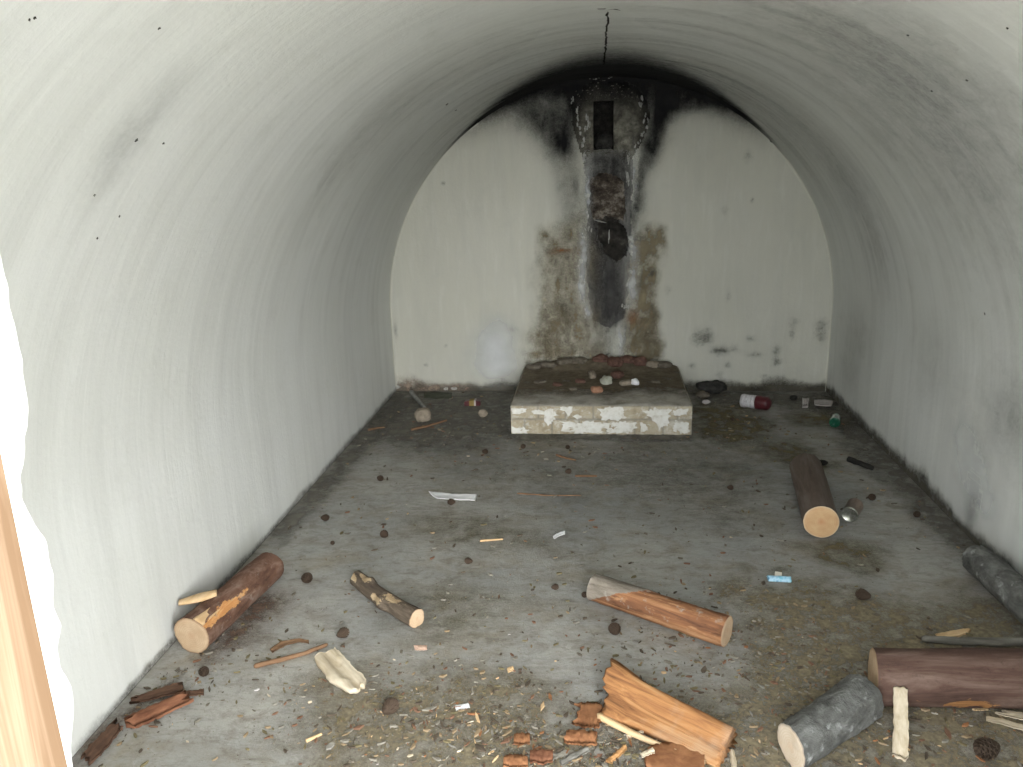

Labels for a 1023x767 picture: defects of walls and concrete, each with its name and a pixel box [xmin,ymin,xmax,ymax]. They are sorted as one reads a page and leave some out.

crack [597,8,621,58]
spalling [571,77,649,349]
damp [533,228,607,359]
damp [625,228,666,361]
peeling [511,406,690,434]